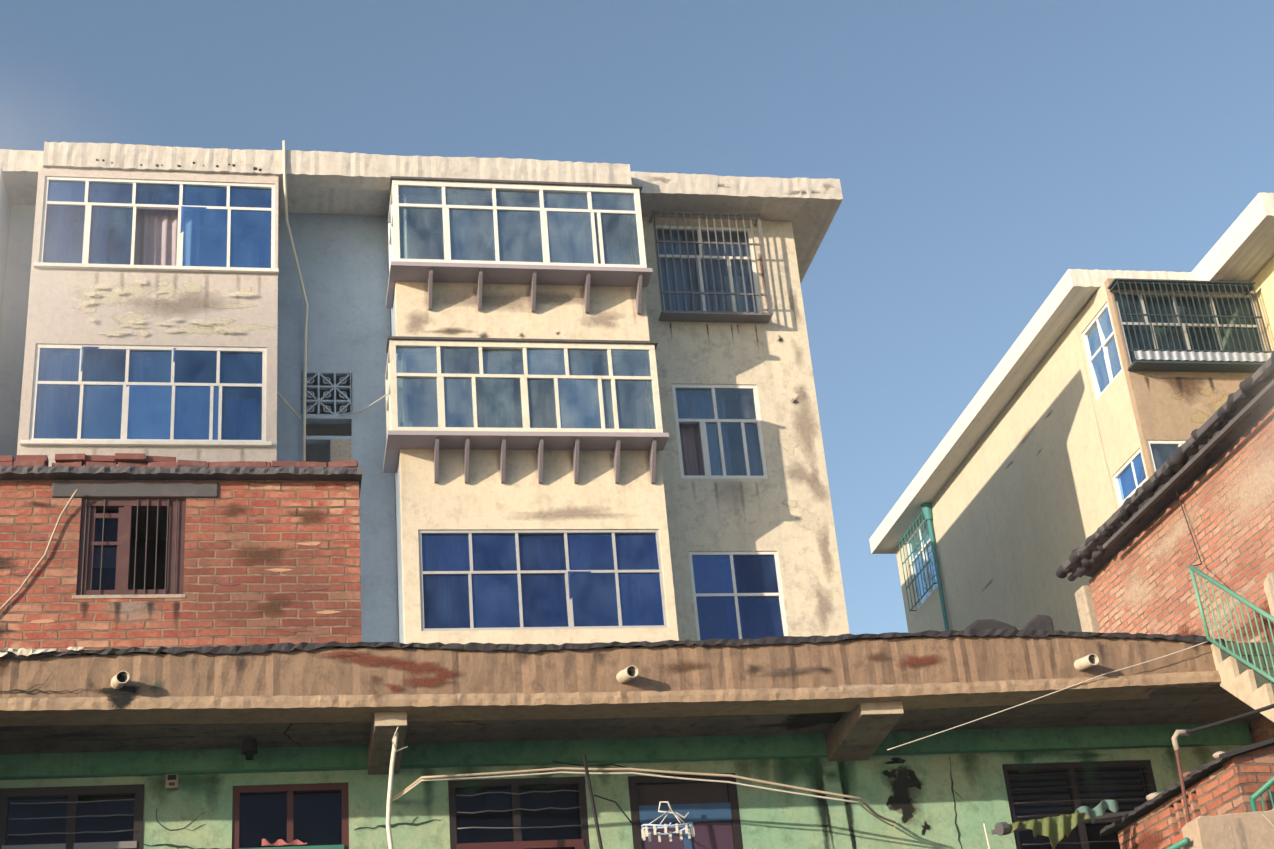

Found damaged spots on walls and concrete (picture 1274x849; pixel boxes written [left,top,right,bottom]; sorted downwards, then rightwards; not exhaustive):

peeling [76,279,268,336]
leakage [86,681,158,709]
flaking render [320,651,458,691]
crack [143,809,230,849]
leakage [739,758,856,849]
peeling [882,757,930,835]